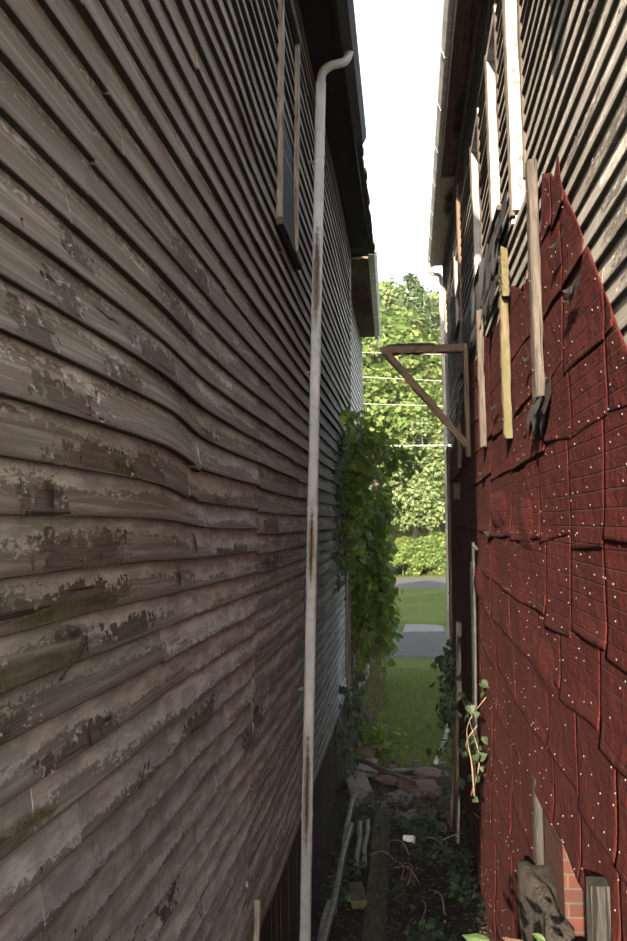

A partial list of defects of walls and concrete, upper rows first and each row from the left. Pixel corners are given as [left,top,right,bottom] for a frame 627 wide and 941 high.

peeling [585,93,627,190]
peeling [600,165,627,291]
peeling [38,434,166,486]
peeling [0,477,140,628]
peeling [96,610,159,649]
peeling [0,701,43,741]
peeling [23,710,122,780]
peeling [144,874,180,941]